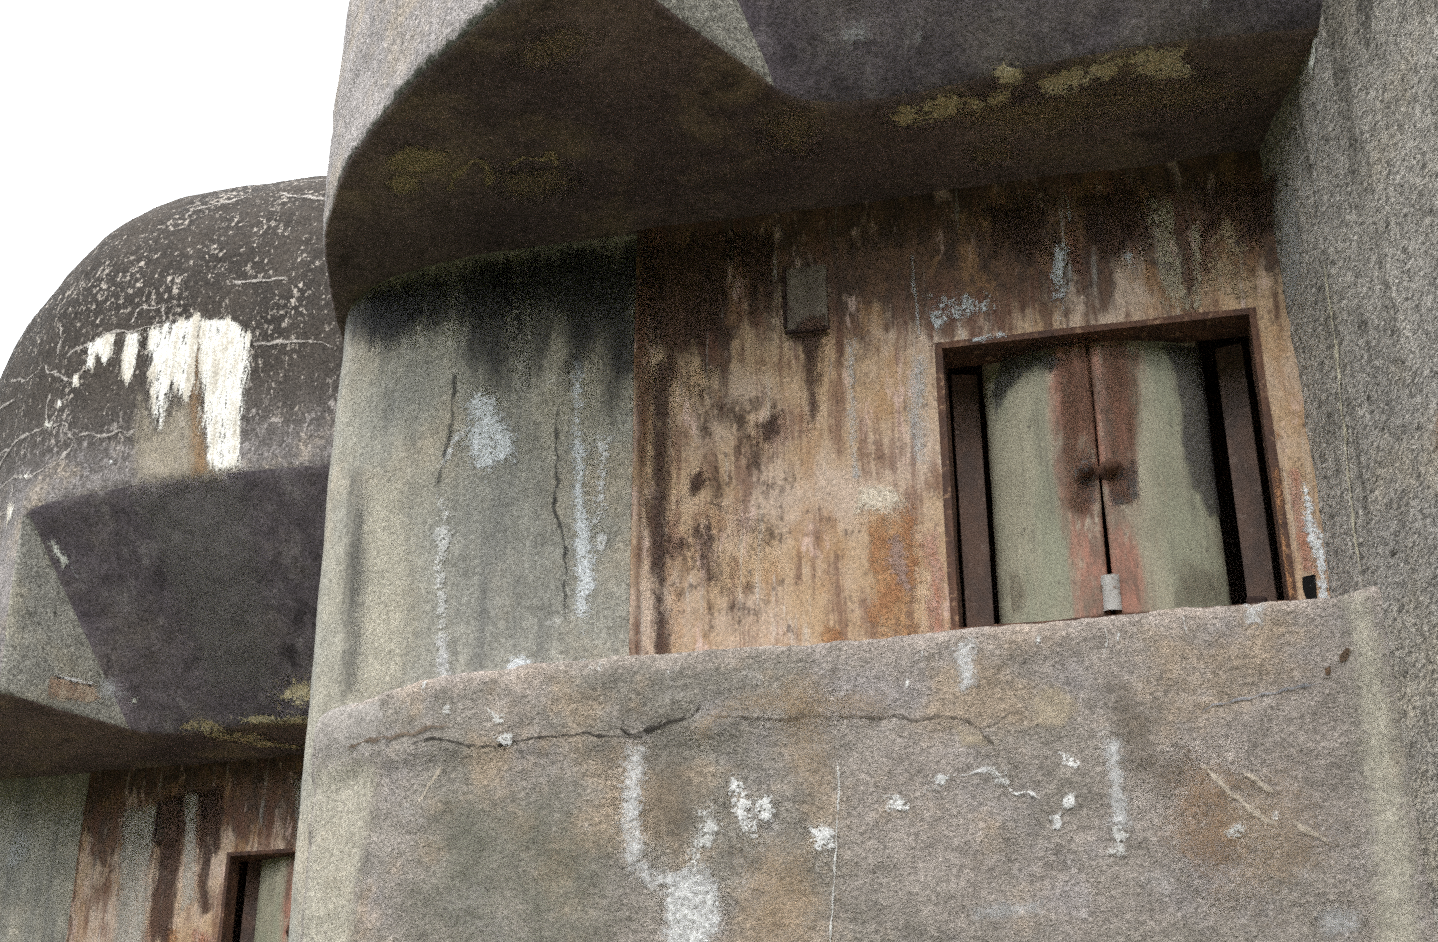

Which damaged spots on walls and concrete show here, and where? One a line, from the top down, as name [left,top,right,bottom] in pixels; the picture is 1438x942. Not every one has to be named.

crack [0,305,168,527]
water stain [72,312,252,473]
crack [255,339,332,347]
water stain [346,243,636,617]
crack [552,412,568,603]
rust [867,507,945,638]
rust [1060,342,1138,512]
water stain [1164,344,1221,520]
rust [1275,468,1316,595]
crack [349,707,1021,748]
rust [150,786,224,942]
water stain [619,746,775,942]